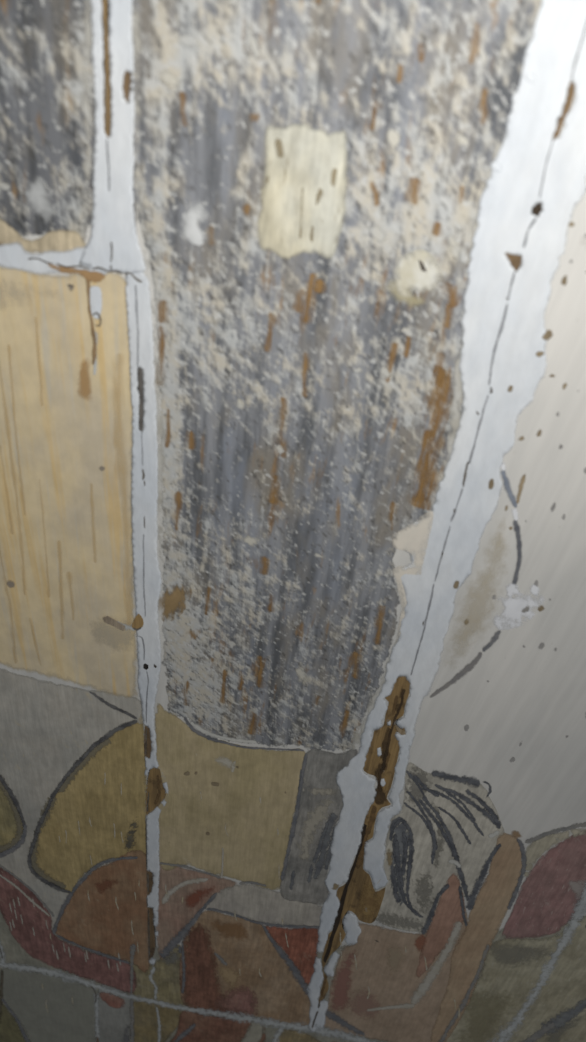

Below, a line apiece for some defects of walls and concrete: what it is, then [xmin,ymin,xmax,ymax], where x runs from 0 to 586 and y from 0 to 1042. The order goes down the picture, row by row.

damp [316,169,337,205]
peeling [536,330,553,357]
peeling [123,0,543,751]
spalling [103,614,144,631]
peeling [492,580,551,630]